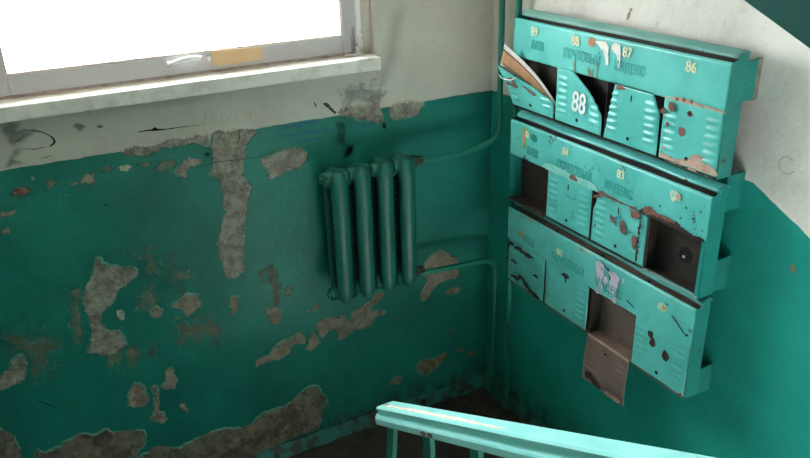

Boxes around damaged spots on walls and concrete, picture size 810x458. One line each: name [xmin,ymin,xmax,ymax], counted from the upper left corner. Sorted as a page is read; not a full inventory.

peeling [314,99,424,125]
peeling [261,145,309,179]
peeling [70,128,256,279]
peeling [420,248,461,302]
peeling [68,246,223,366]
peeling [256,291,387,368]
peeling [0,331,64,391]
peeling [415,347,474,375]
peeling [34,384,329,458]